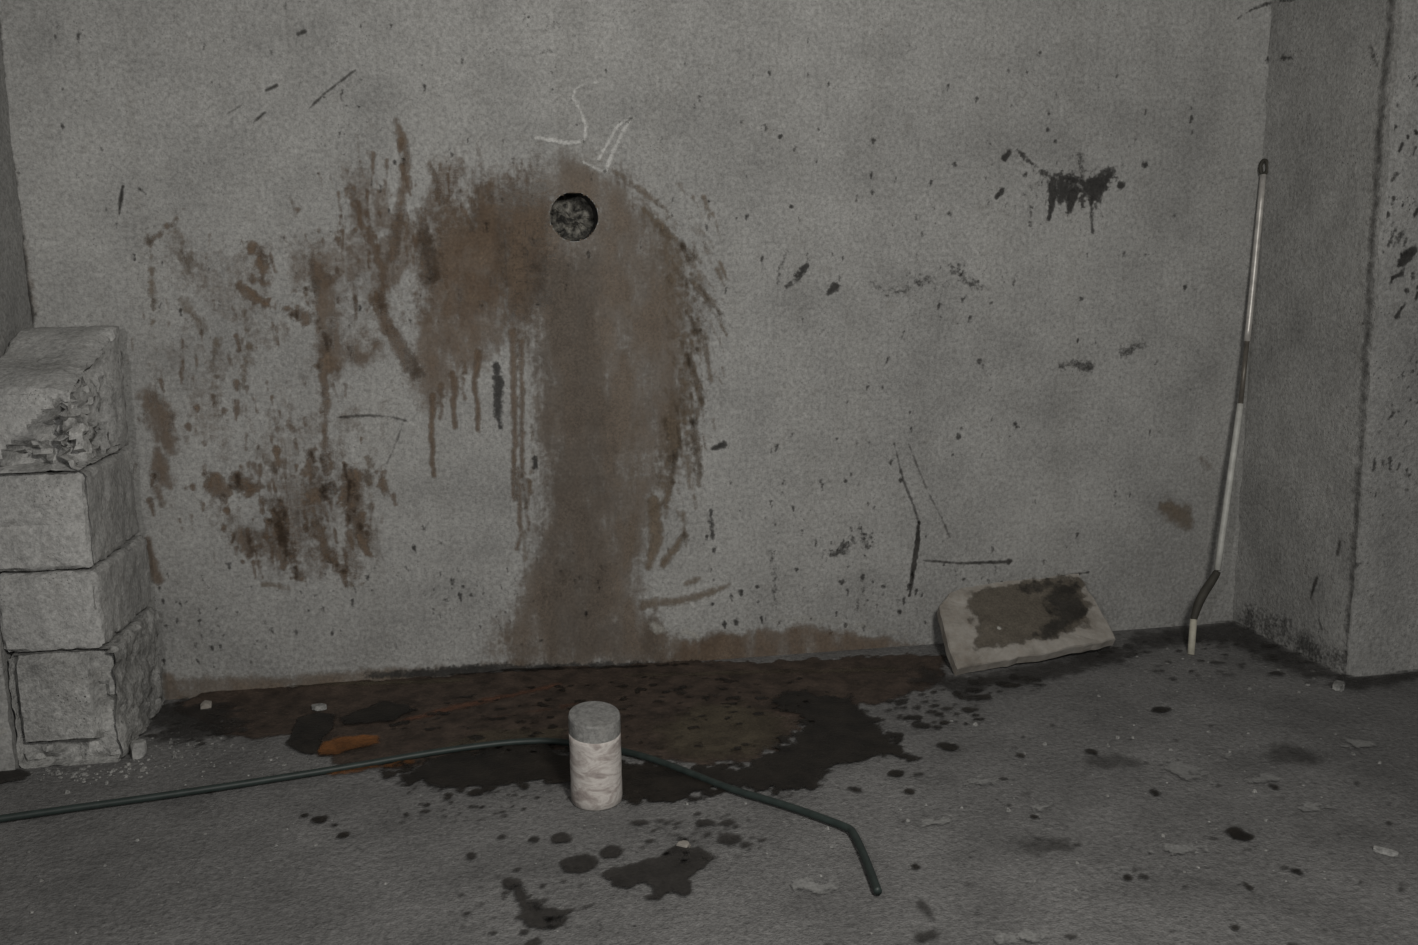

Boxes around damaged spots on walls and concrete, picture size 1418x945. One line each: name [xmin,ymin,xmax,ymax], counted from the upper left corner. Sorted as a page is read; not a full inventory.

corrosion [145,379,200,515]
corrosion [190,241,394,586]
water stain [145,125,889,745]
corrosion [146,538,162,583]
water stain [300,813,350,837]
water stain [285,701,411,754]
water stain [380,715,571,823]
water stain [503,621,1418,945]